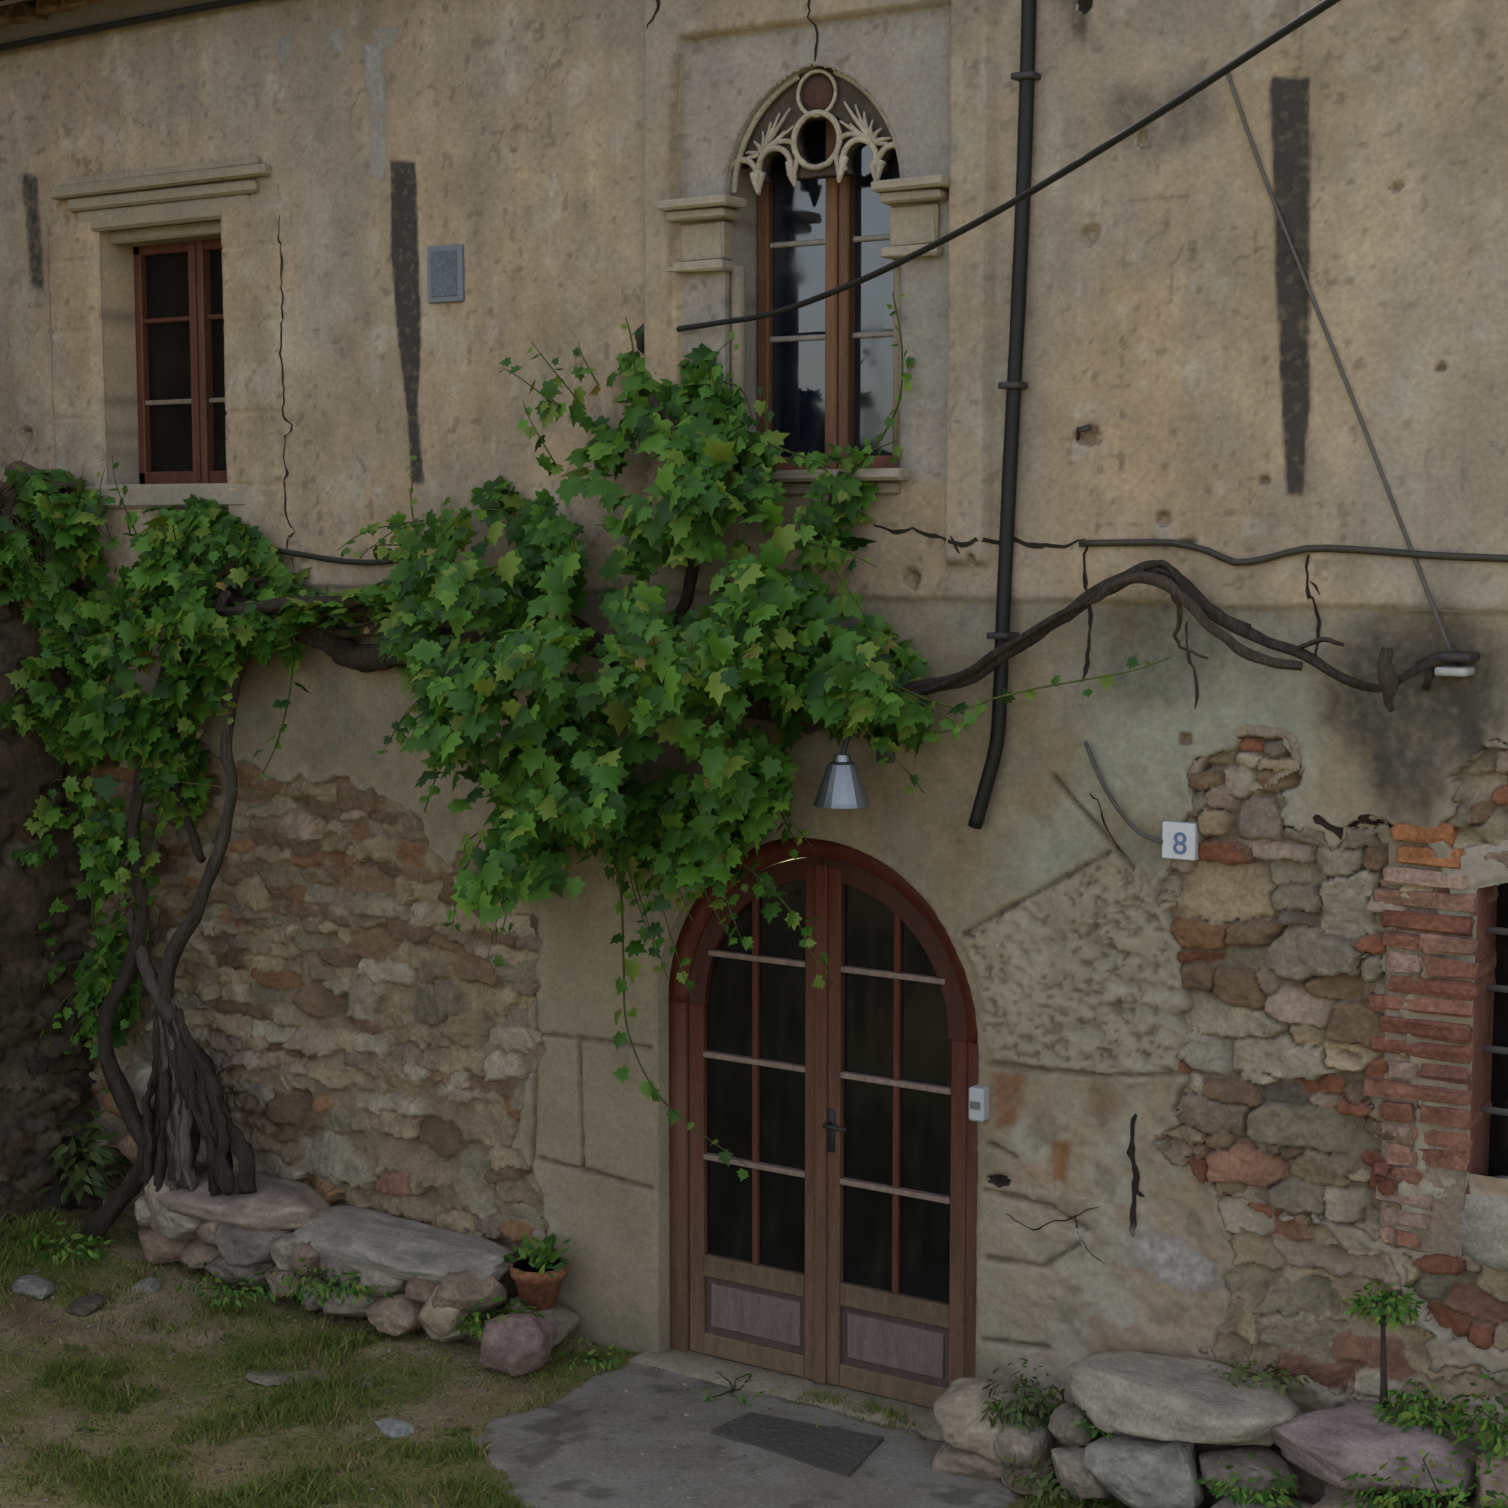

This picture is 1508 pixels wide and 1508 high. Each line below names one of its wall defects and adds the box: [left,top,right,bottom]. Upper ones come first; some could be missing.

crack [646,0,660,29]
crack [807,0,818,62]
flaking render [86,741,549,1258]
flaking render [1152,723,1508,1408]
crack [1007,1114,1145,1264]